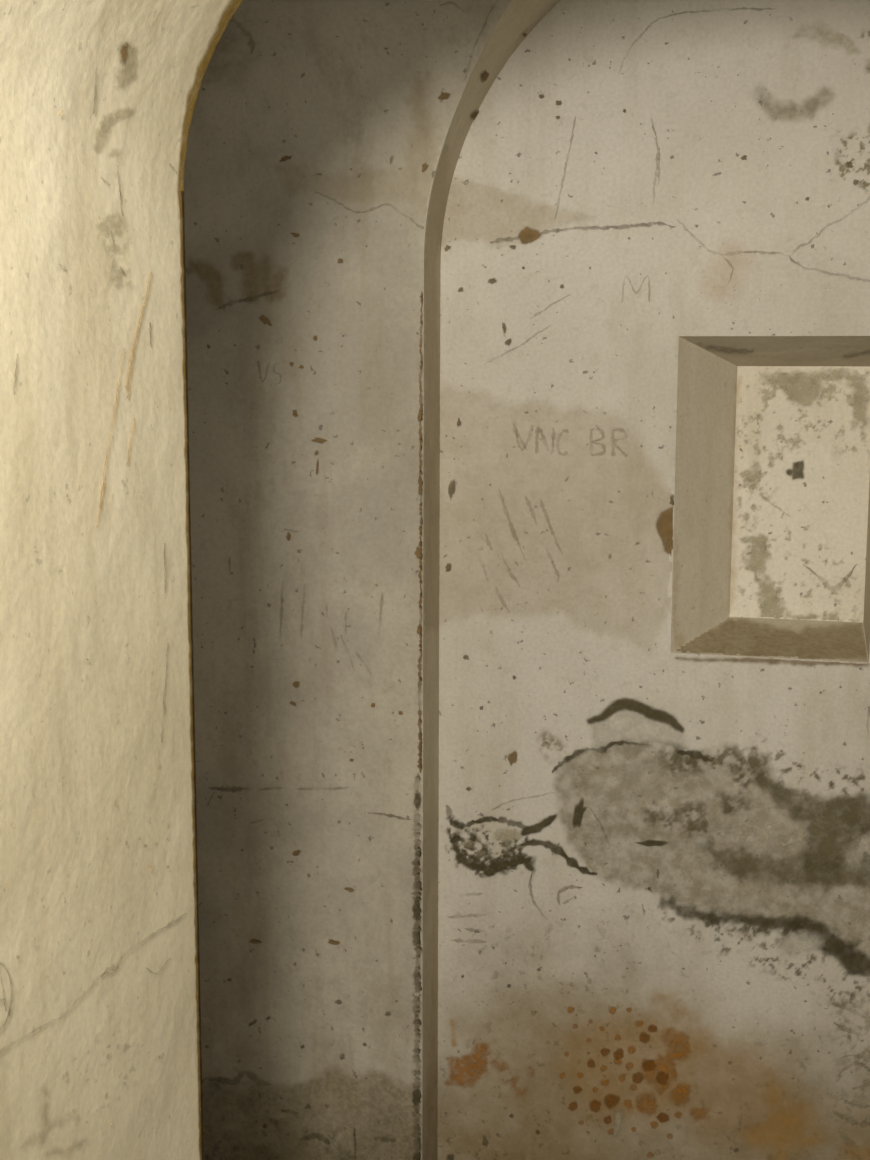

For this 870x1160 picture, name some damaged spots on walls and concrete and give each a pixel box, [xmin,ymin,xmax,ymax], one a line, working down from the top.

flaking render [836,136,870,188]
flaking render [762,371,868,420]
flaking render [787,461,803,479]
leakage [178,0,243,1160]
flaking render [742,536,783,618]
leakage [580,743,870,999]
corrosion [450,1044,487,1085]
corrosion [561,1007,704,1136]